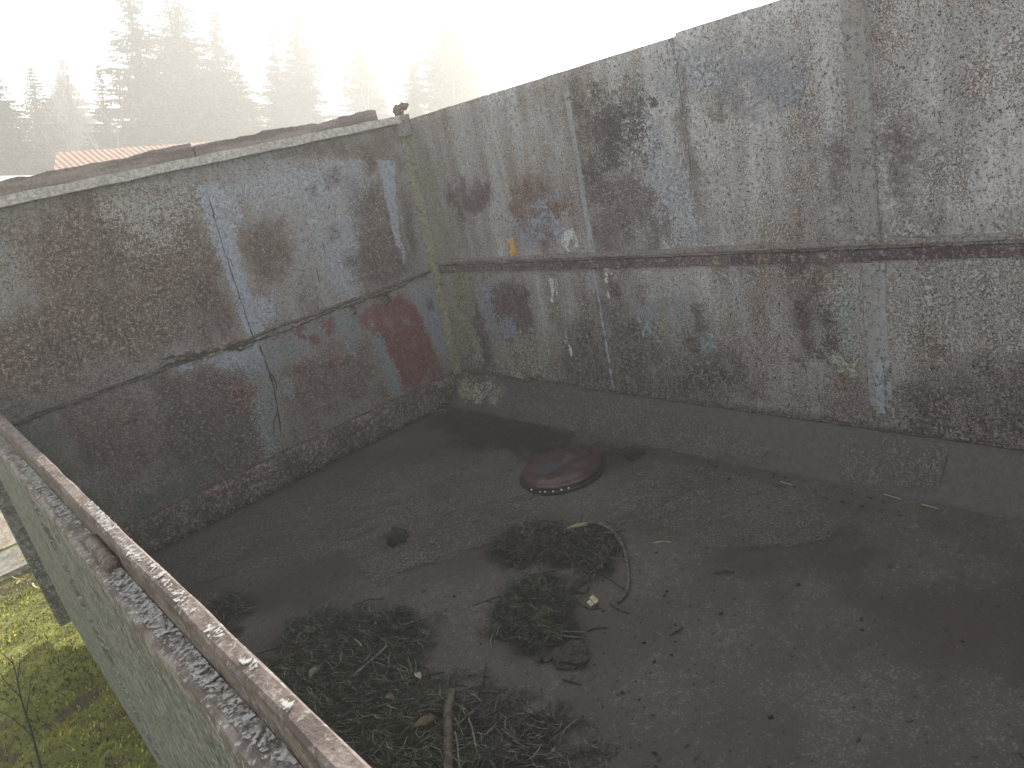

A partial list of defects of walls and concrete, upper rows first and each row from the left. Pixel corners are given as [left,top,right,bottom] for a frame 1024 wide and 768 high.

crack [26,186,429,474]